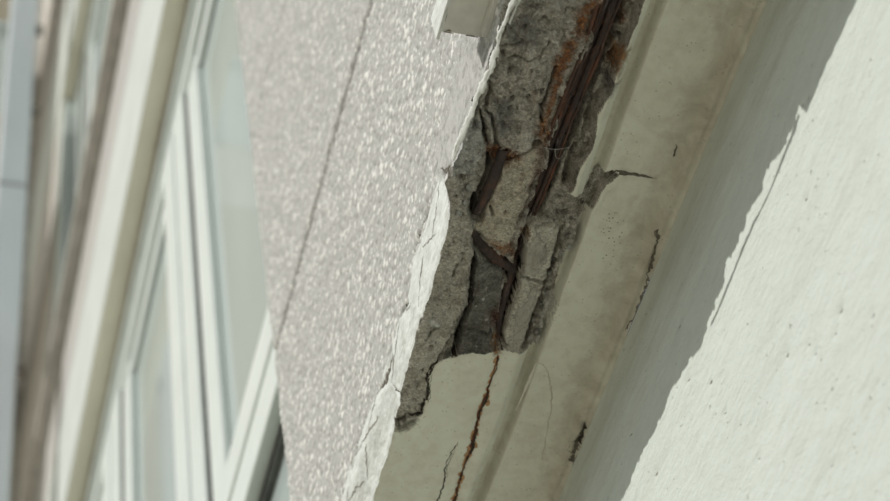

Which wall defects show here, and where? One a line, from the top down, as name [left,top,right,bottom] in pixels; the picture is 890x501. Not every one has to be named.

rust [530,0,601,186]
rust [605,33,628,72]
spalling [394,0,645,426]
crack [609,170,652,178]
crack [625,229,660,331]
crack [437,355,499,501]